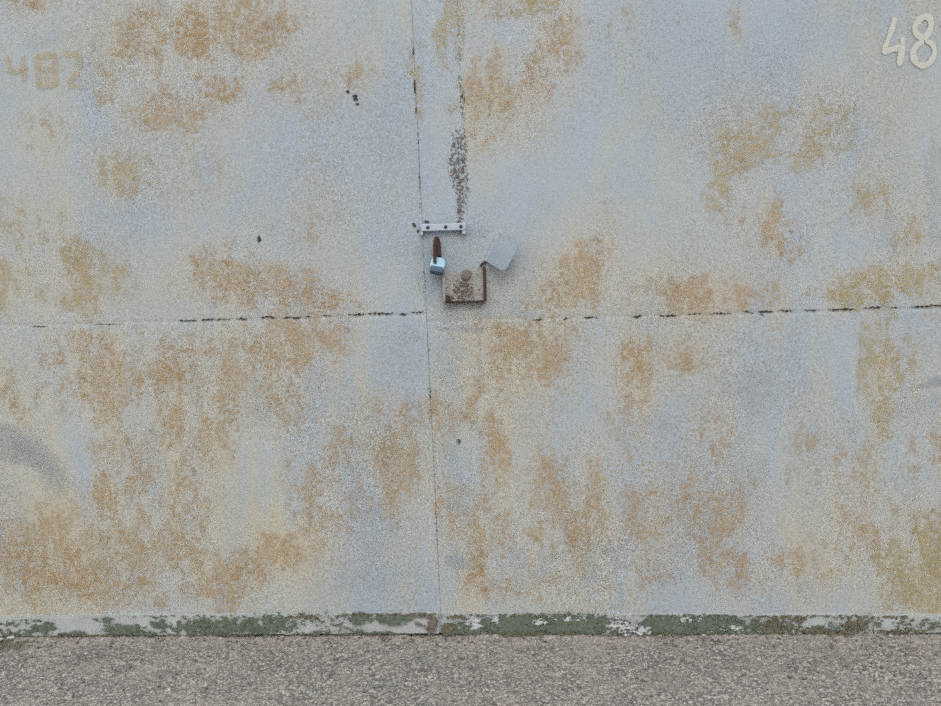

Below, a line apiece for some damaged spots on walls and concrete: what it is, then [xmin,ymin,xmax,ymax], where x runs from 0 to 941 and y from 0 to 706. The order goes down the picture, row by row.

corrosion [131,0,286,55]
corrosion [707,109,792,211]
corrosion [74,333,200,434]
corrosion [5,510,197,608]
corrosion [857,510,941,614]
peeling [93,612,941,638]